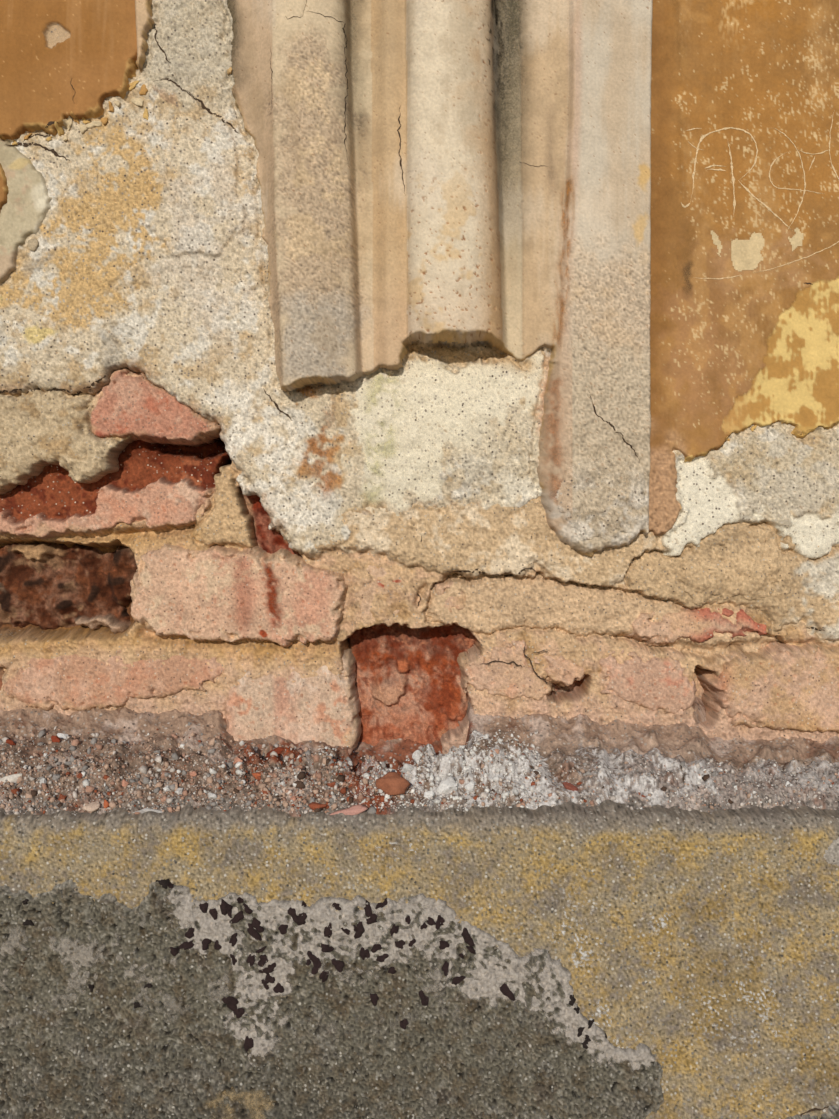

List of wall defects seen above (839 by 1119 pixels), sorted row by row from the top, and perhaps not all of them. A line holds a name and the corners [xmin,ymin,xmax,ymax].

crack [153,23,238,133]
crack [286,0,348,160]
spalling [0,0,552,558]
peeling [711,230,764,271]
peeling [788,228,804,251]
crack [589,392,640,463]
spalling [661,279,839,559]
spalling [0,542,138,634]
spalling [348,623,475,746]
peeling [0,879,655,1070]
spalling [209,1091,272,1119]